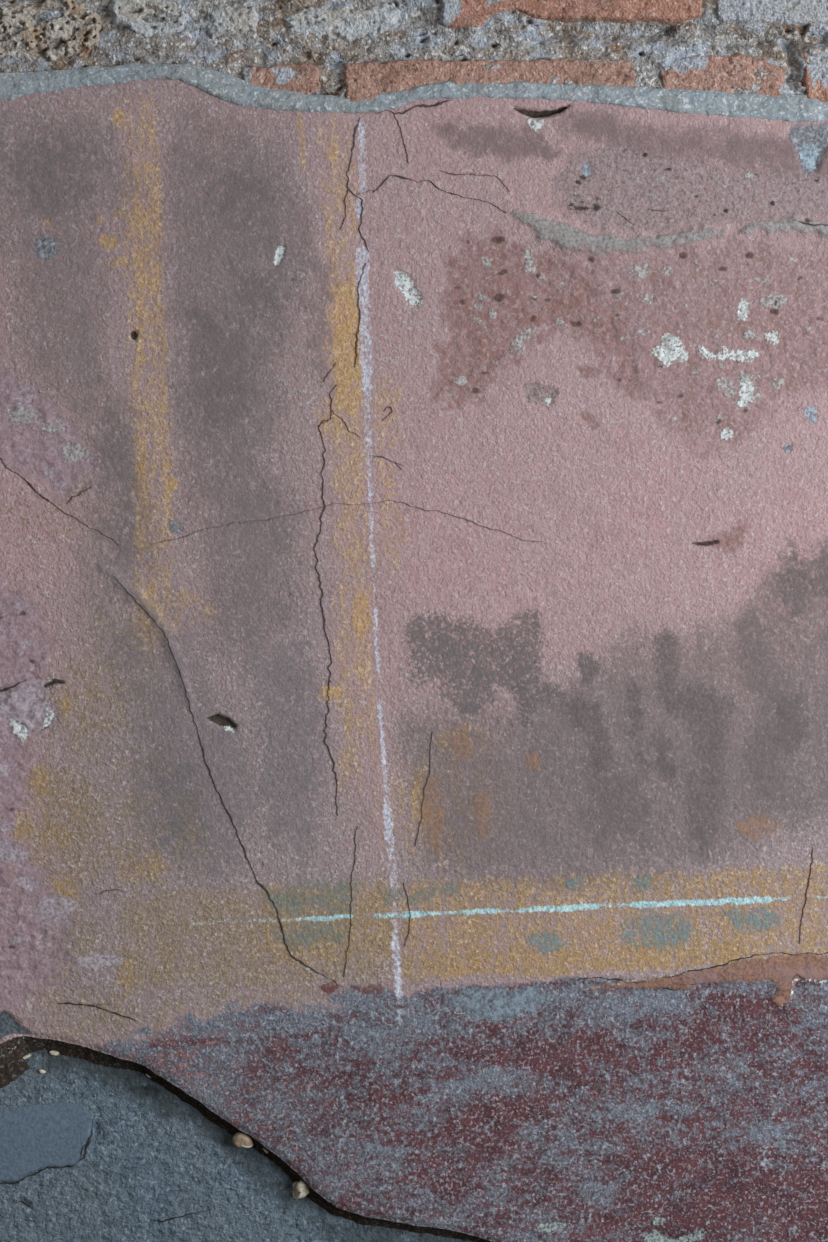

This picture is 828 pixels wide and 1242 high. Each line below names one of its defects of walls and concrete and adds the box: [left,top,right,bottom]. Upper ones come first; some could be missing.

crack [1,458,119,545]
crack [114,100,543,987]
damp [418,637,800,887]
spalling [0,587,491,1242]
peeling [591,953,828,1006]
flaking render [643,1217,705,1242]